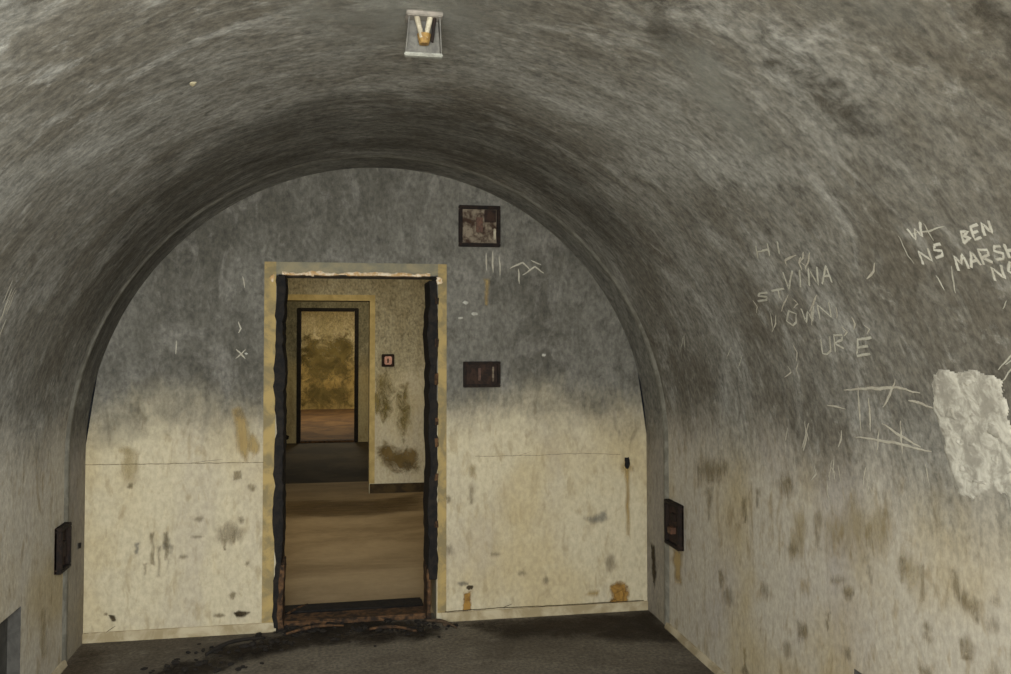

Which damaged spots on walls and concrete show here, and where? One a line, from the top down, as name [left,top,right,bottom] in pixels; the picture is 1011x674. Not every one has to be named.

flaking render [932,369,1011,514]
water stain [378,445,418,473]
rust [610,582,629,603]